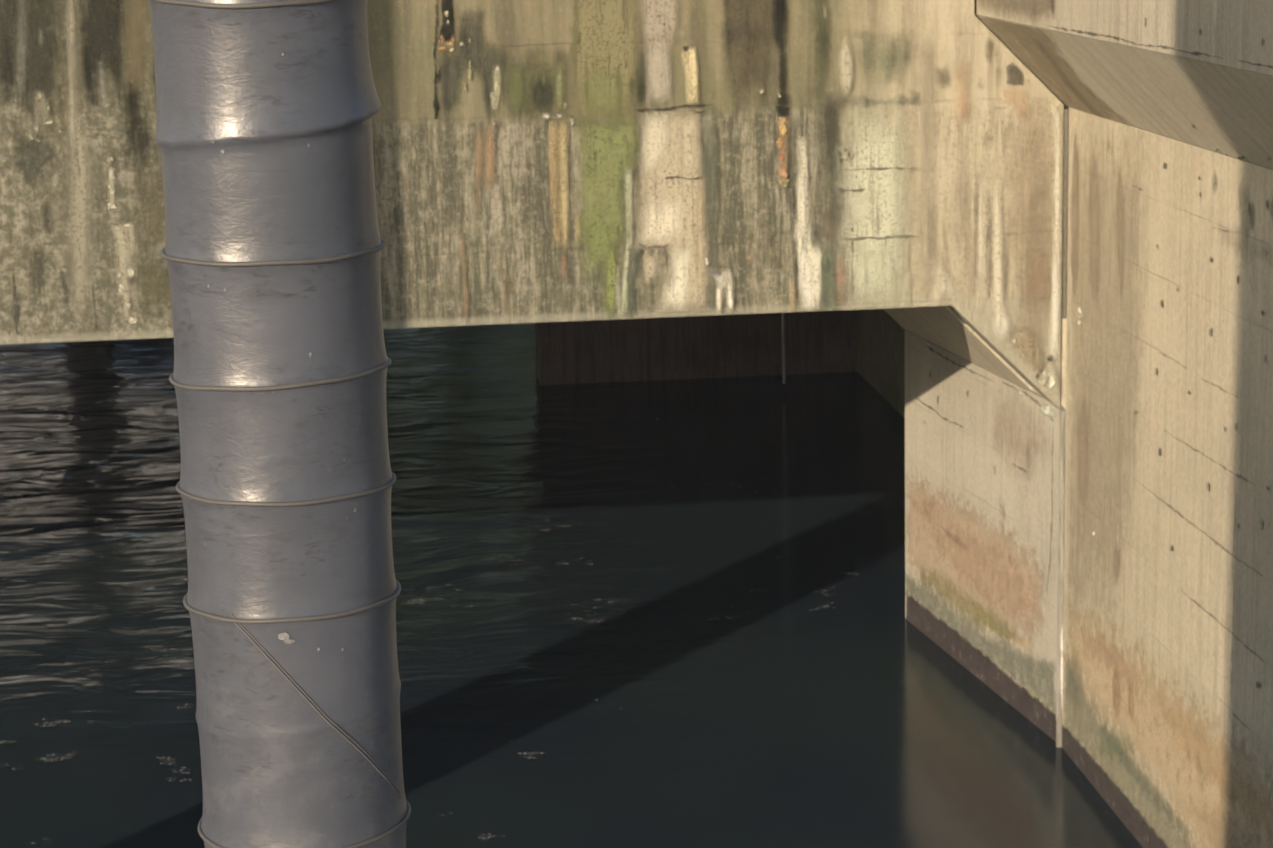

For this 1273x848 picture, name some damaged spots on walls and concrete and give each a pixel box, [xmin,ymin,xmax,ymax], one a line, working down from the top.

damp [0,0,122,105]
damp [125,94,150,162]
damp [63,94,97,330]
damp [607,168,632,313]
damp [906,596,1167,848]